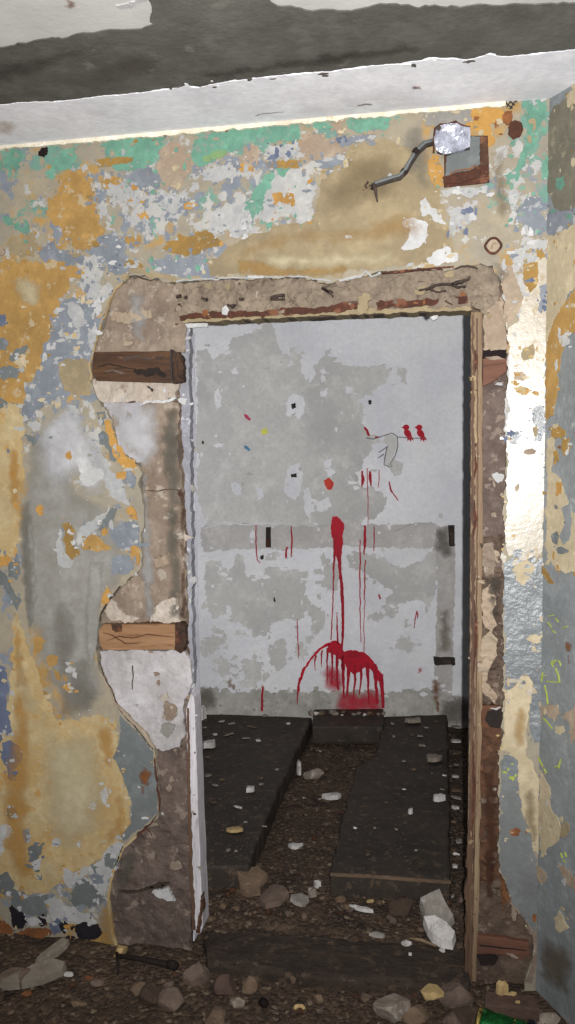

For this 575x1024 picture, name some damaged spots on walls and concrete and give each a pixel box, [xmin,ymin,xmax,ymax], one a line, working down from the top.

peeling [0,0,575,104]
peeling [0,147,24,180]
peeling [45,144,81,180]
peeling [422,107,523,148]
peeling [504,99,547,190]
peeling [45,172,143,275]
corrosion [175,302,358,325]
peeling [53,503,141,575]
peeling [346,521,456,657]
peeling [46,655,79,693]
peeling [198,552,469,729]
crack [119,882,170,894]